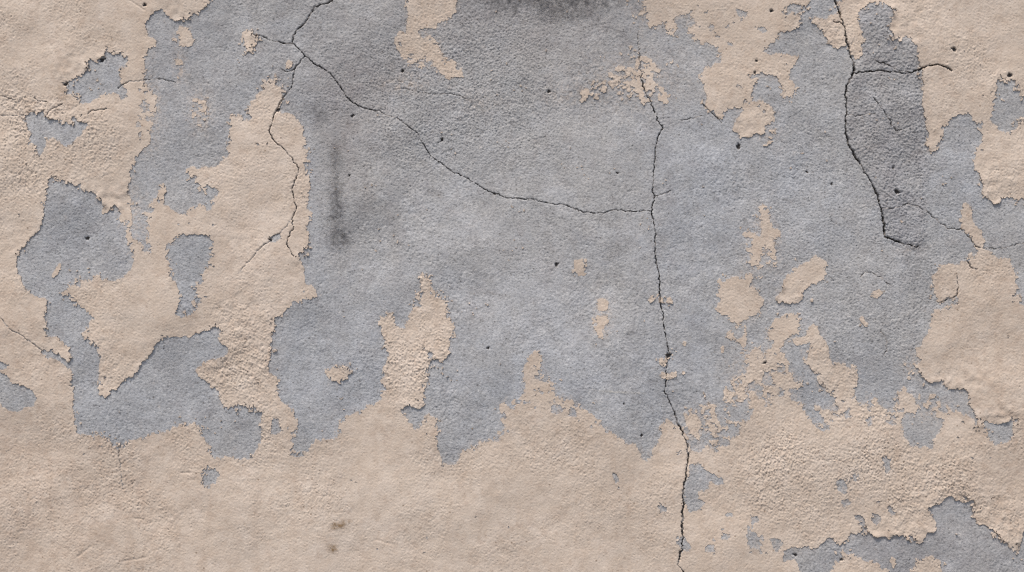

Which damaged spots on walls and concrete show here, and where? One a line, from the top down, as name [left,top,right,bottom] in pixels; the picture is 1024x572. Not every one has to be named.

peeling [0,361,37,412]
peeling [23,47,129,157]
peeling [16,175,263,460]
crack [238,0,722,571]
peeling [126,0,1024,467]
peeling [746,474,1024,572]
crack [834,0,1024,303]